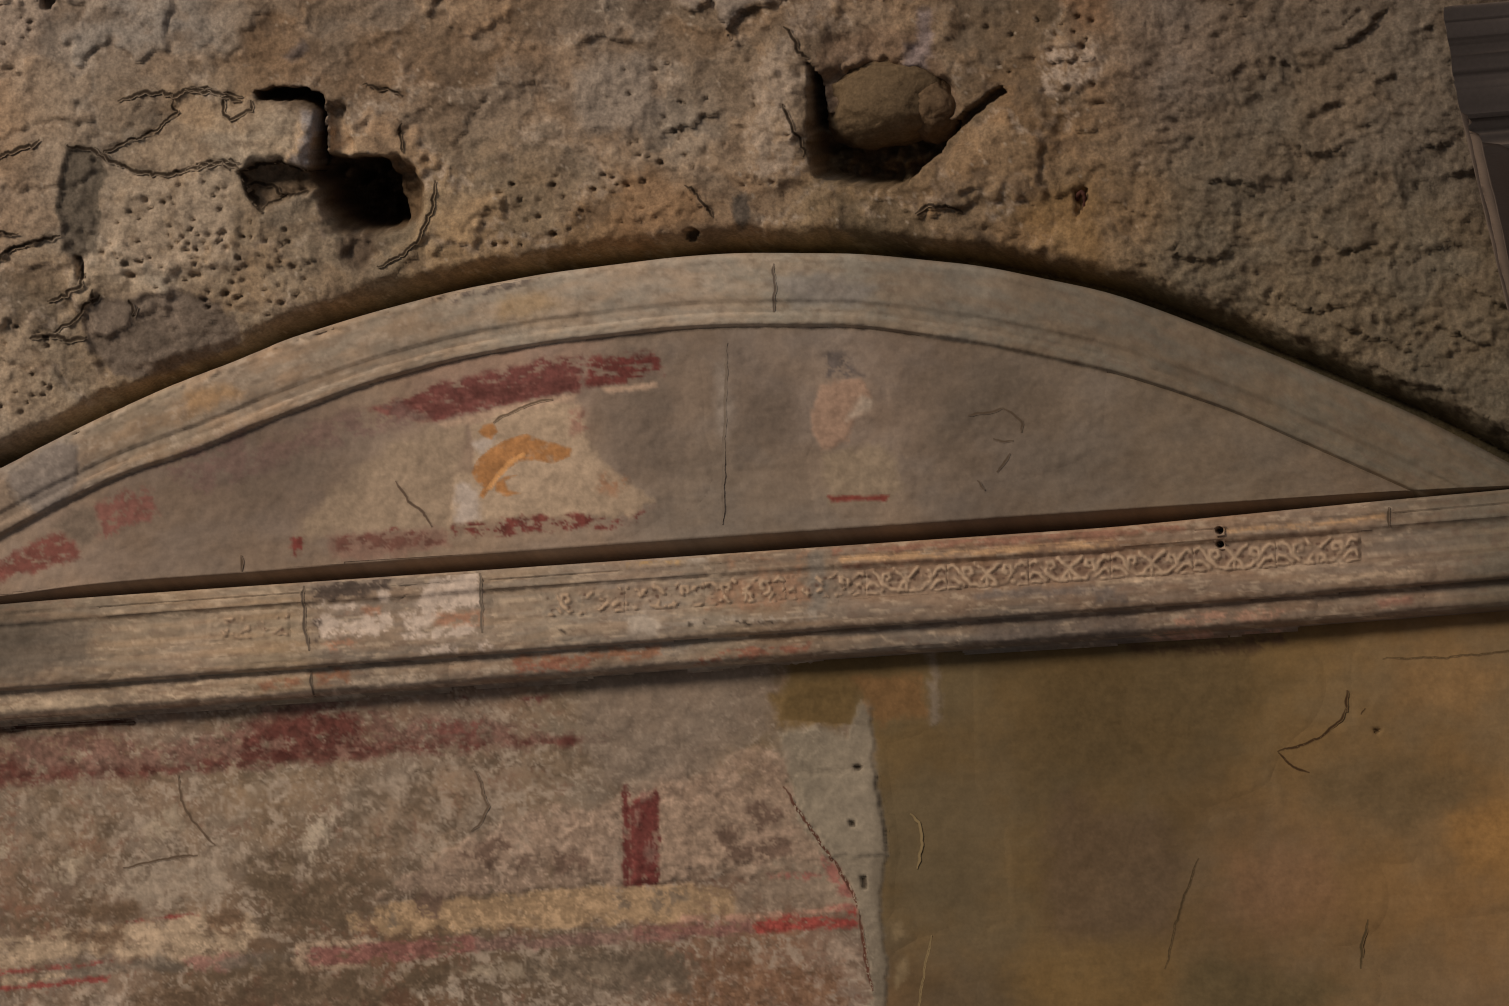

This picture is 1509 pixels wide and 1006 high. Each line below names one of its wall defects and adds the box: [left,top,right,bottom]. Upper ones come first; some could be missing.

spalling [729,0,885,201]
crack [0,74,404,223]
crack [377,180,436,268]
crack [0,229,139,343]
peeling [0,573,566,806]
crack [1277,690,1375,773]
crack [1383,649,1509,660]
crack [782,786,874,991]
spalling [859,875,868,890]
crack [910,813,924,869]
crack [917,935,932,1006]